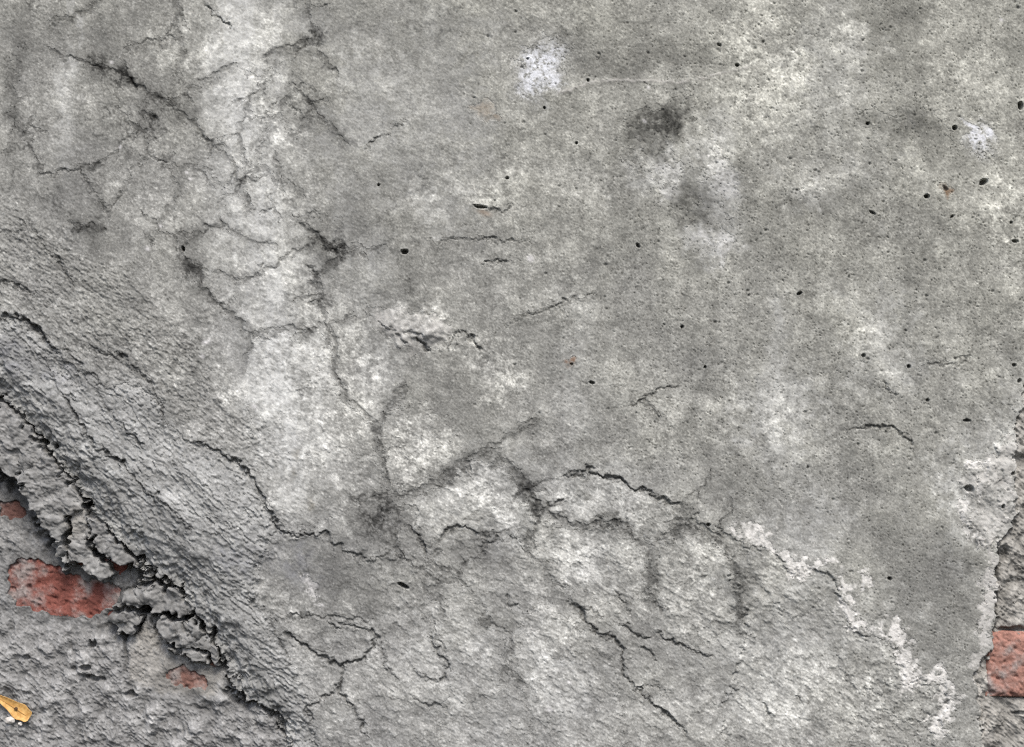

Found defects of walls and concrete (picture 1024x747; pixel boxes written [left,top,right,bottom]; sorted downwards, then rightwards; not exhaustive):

crack [0,0,765,737]
crack [842,424,914,454]
spalling [0,397,291,747]
leakage [729,521,829,577]
leakage [838,567,873,631]
peeling [957,392,1024,634]
leakage [888,615,966,740]
spalling [972,660,1024,747]